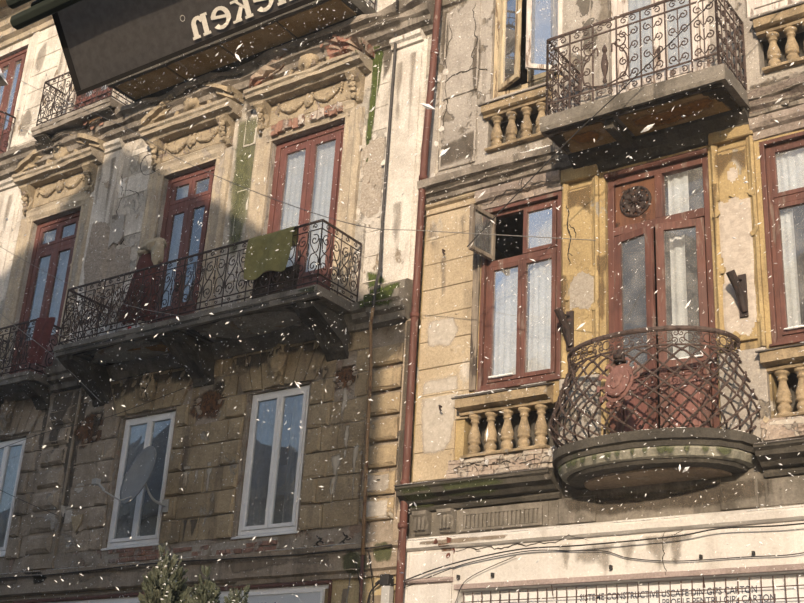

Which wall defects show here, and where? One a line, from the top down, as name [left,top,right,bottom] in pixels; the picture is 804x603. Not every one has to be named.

crack [443,4,488,134]
spalling [575,0,598,71]
crack [566,205,576,264]
peeling [564,262,598,319]
peeling [712,167,762,348]
peeling [417,375,555,465]
flaking render [104,537,279,564]